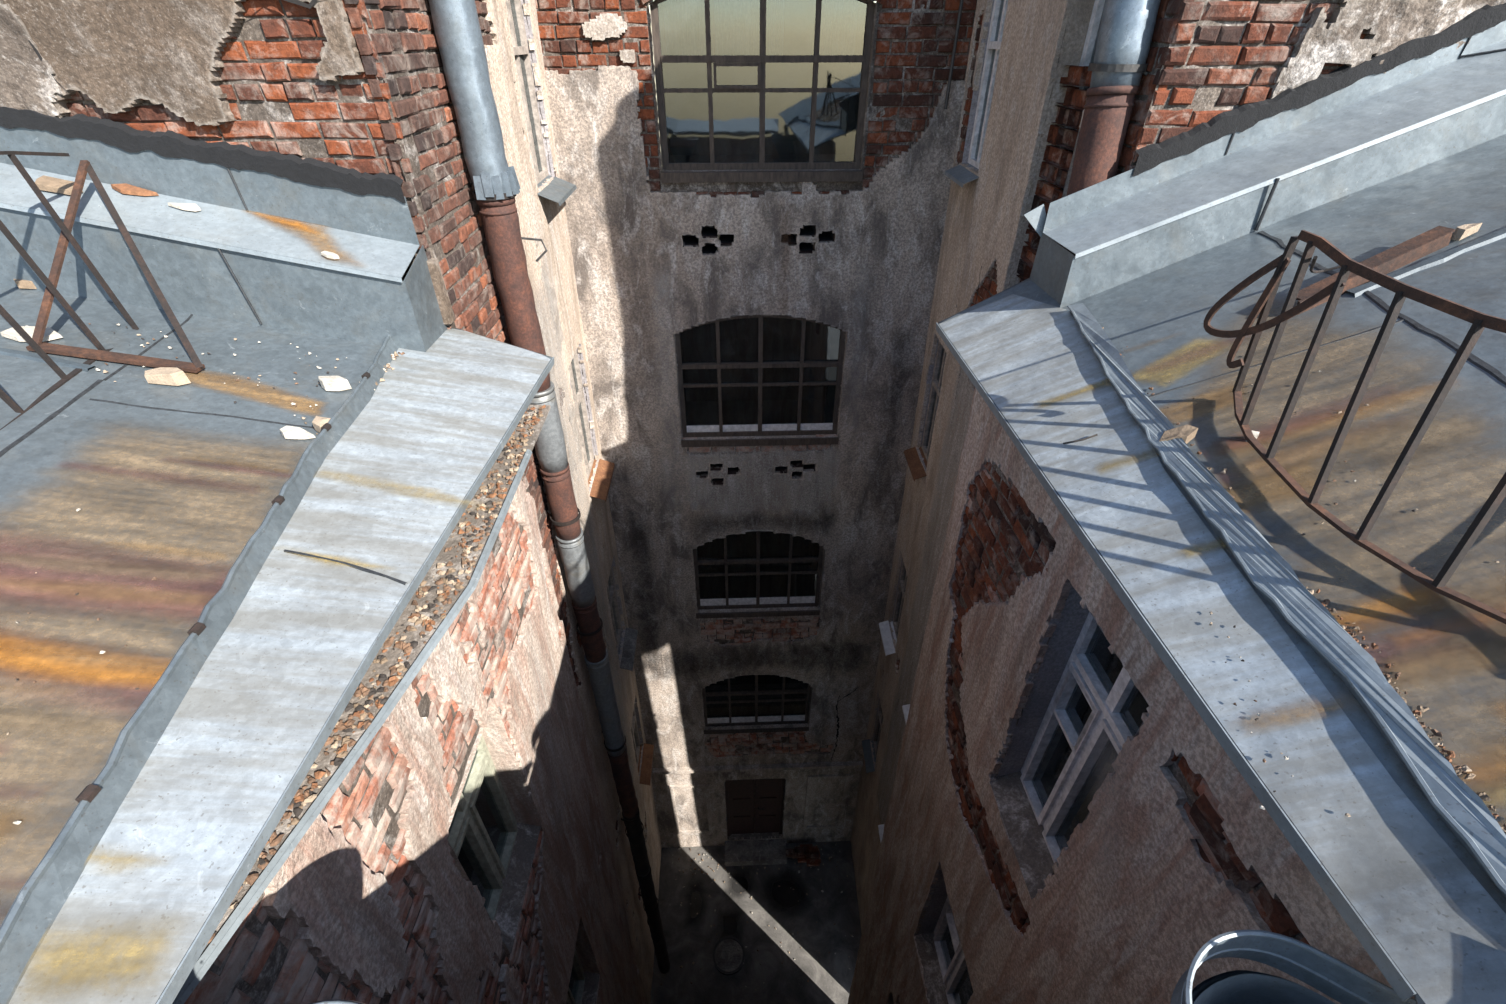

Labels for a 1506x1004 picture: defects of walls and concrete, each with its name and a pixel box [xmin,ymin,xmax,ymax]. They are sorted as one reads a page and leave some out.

spalling [0,0,413,182]
spalling [535,0,661,191]
spalling [820,0,977,194]
peeling [1270,0,1506,99]
corrosion [1041,379,1110,405]
corrosion [0,438,298,904]
spalling [700,617,819,645]
spalling [946,462,1056,934]
corrosion [1133,309,1506,816]